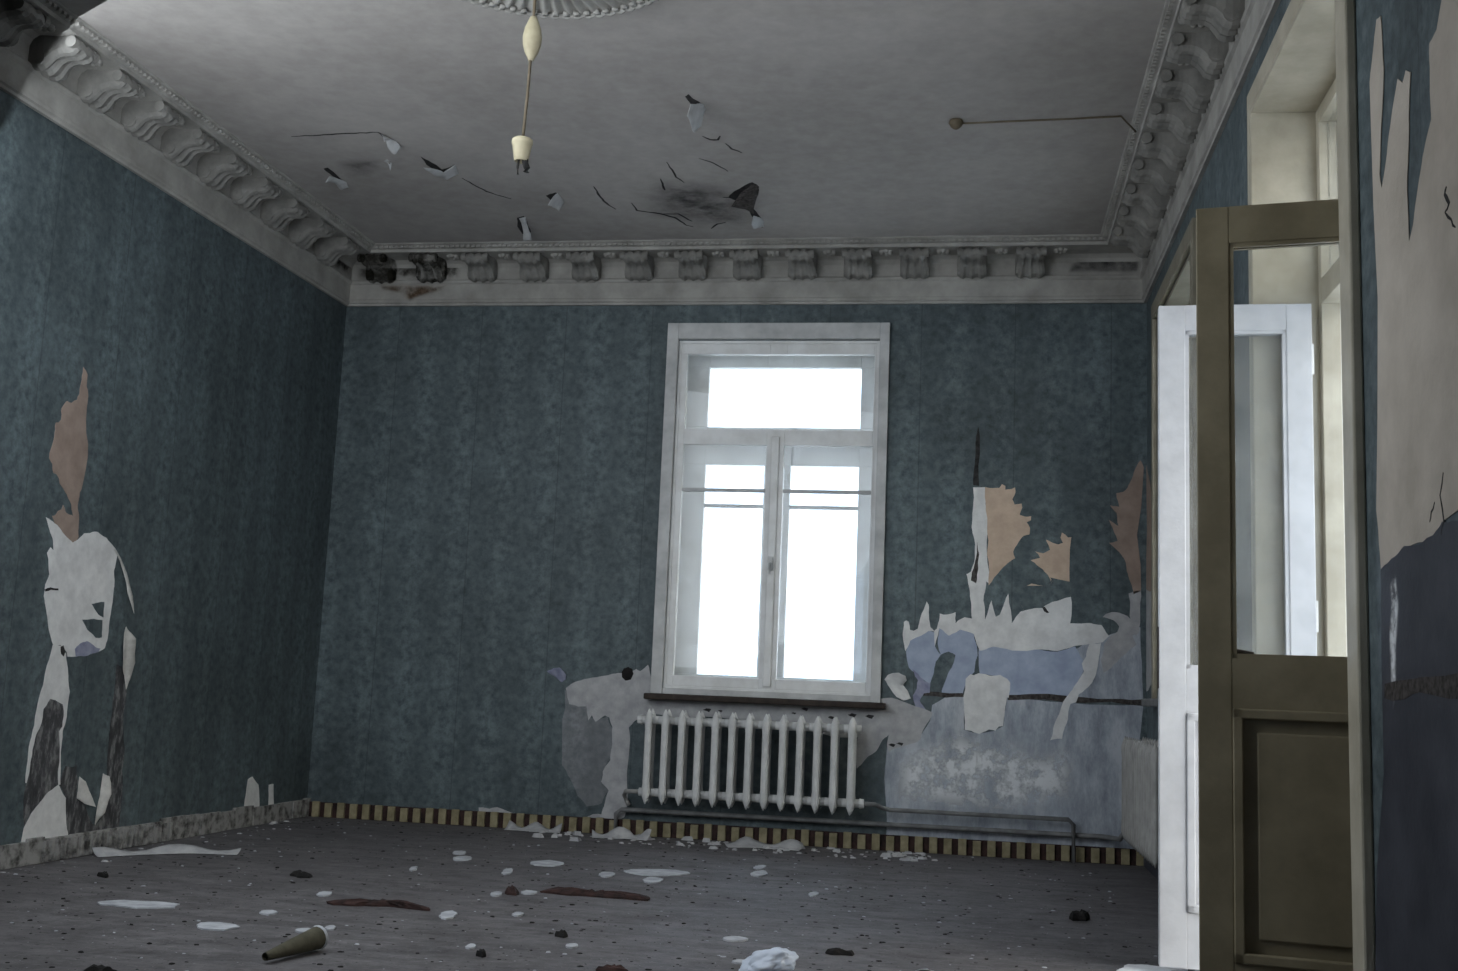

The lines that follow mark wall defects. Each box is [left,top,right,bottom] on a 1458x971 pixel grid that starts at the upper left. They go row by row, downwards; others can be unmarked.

peeling [685,94,706,133]
peeling [421,157,459,180]
peeling [517,216,532,241]
peeling [546,192,564,211]
peeling [728,182,764,229]
flaking render [1370,0,1458,568]
flaking render [21,517,117,842]
peeling [547,589,1151,849]